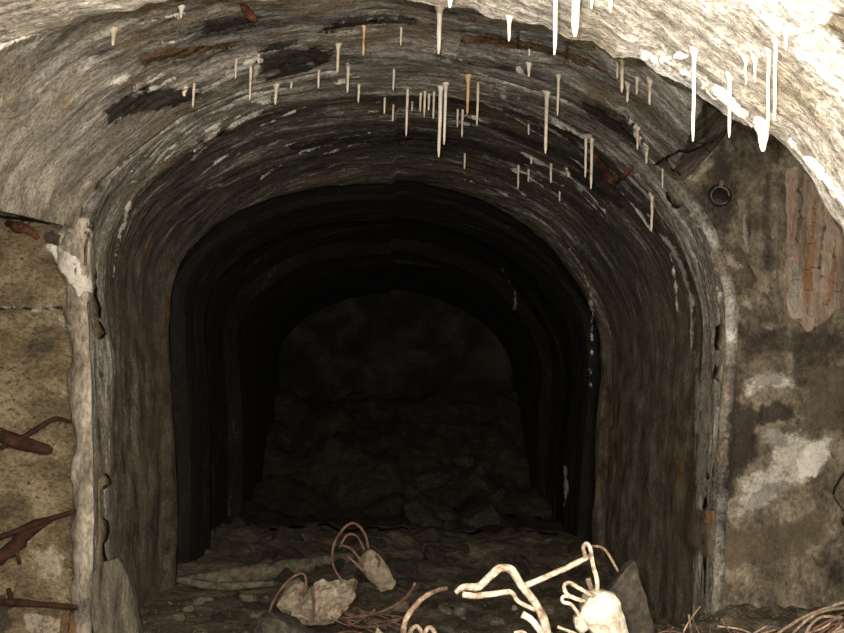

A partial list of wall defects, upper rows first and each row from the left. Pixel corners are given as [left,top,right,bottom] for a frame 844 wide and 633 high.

damp [317,17,412,33]
damp [102,40,328,171]
damp [261,107,406,154]
damp [640,51,754,127]
spalling [687,162,714,183]
crack [0,305,65,313]
spalling [44,179,98,304]
damp [113,194,136,277]
damp [334,49,713,495]
flaking render [725,164,844,332]
flaking render [745,373,798,397]
damp [727,368,794,497]